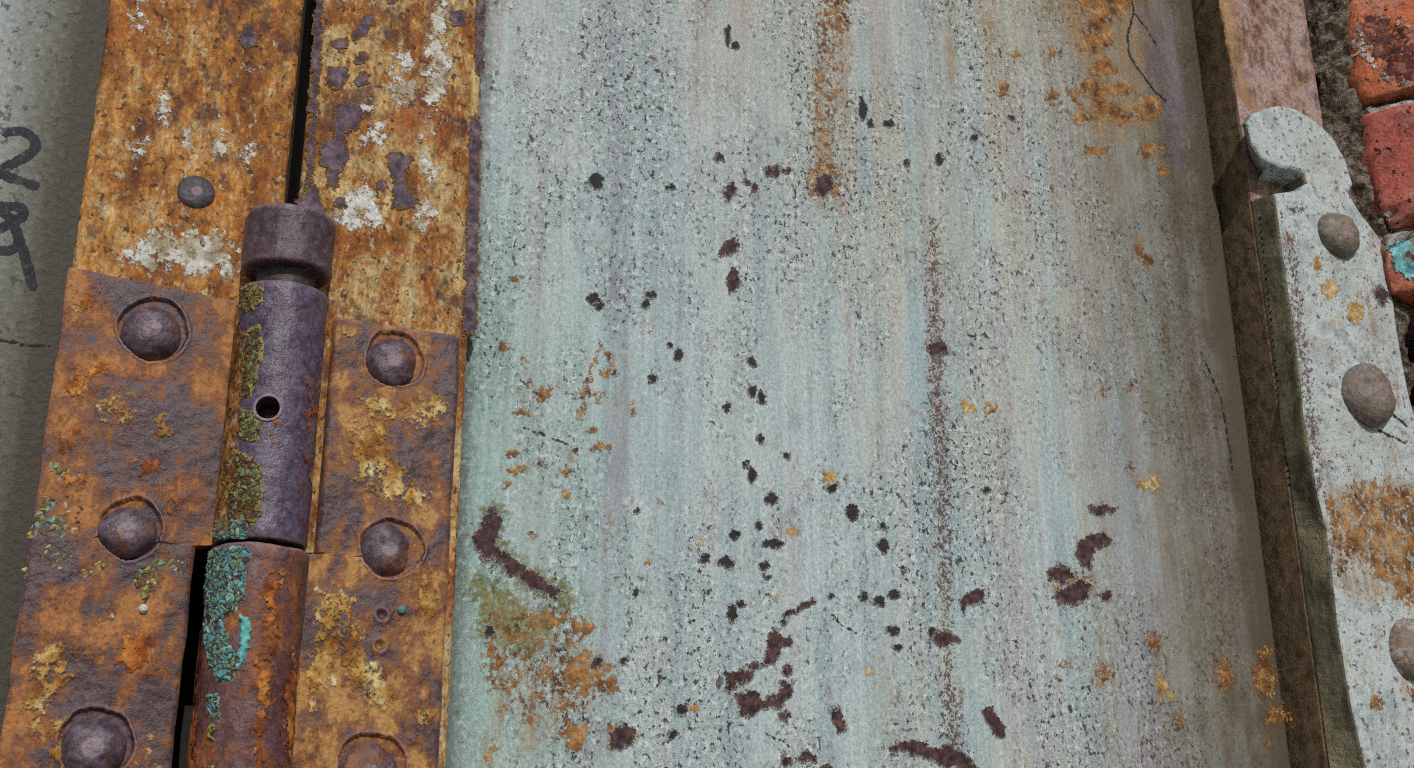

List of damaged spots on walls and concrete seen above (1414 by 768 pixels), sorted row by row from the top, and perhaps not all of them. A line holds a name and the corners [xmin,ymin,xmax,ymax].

corrosion [807,0,852,172]
corrosion [1044,0,1163,156]
corrosion [1132,232,1154,272]
corrosion [64,360,136,431]
corrosion [212,313,246,536]
corrosion [348,392,456,506]
corrosion [499,341,618,499]
corrosion [1282,231,1414,610]
corrosion [20,633,93,768]
corrosion [96,613,163,683]
corrosion [250,568,436,768]
corrosion [462,574,621,752]